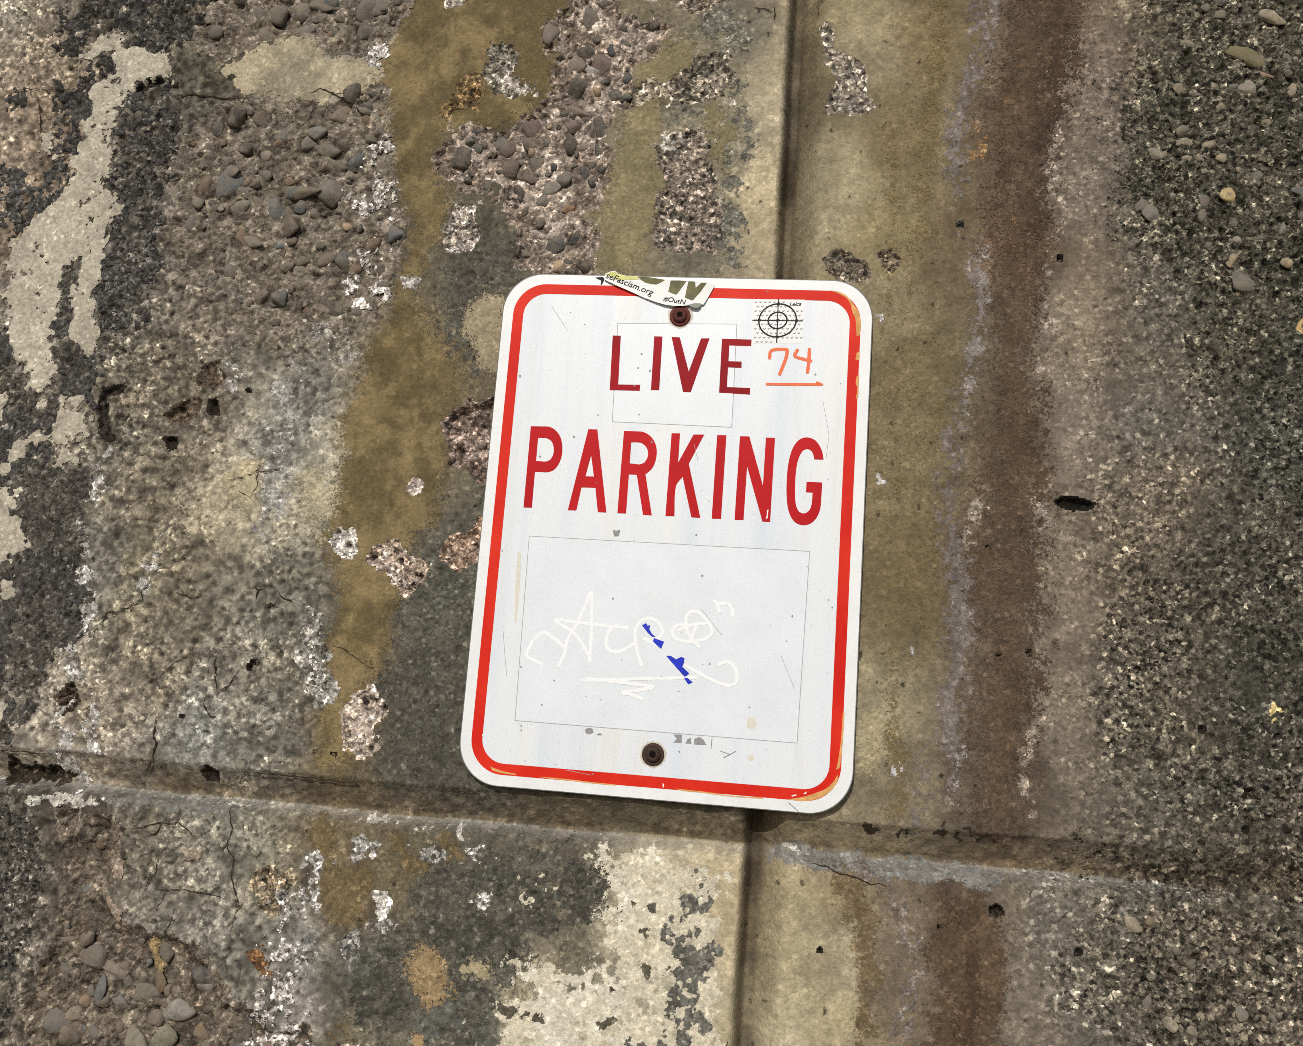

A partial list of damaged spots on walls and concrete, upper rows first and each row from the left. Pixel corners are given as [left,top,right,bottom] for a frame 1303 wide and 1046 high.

spalling [431,0,735,275]
damp [1042,119,1072,278]
peeling [0,31,175,600]
damp [1020,293,1058,390]
damp [867,0,1004,848]
peeling [56,572,95,650]
spalling [328,516,482,600]
damp [1028,490,1056,532]
spalling [294,606,389,761]
damp [1016,712,1049,821]
peeling [517,874,558,909]
peeling [500,954,532,987]